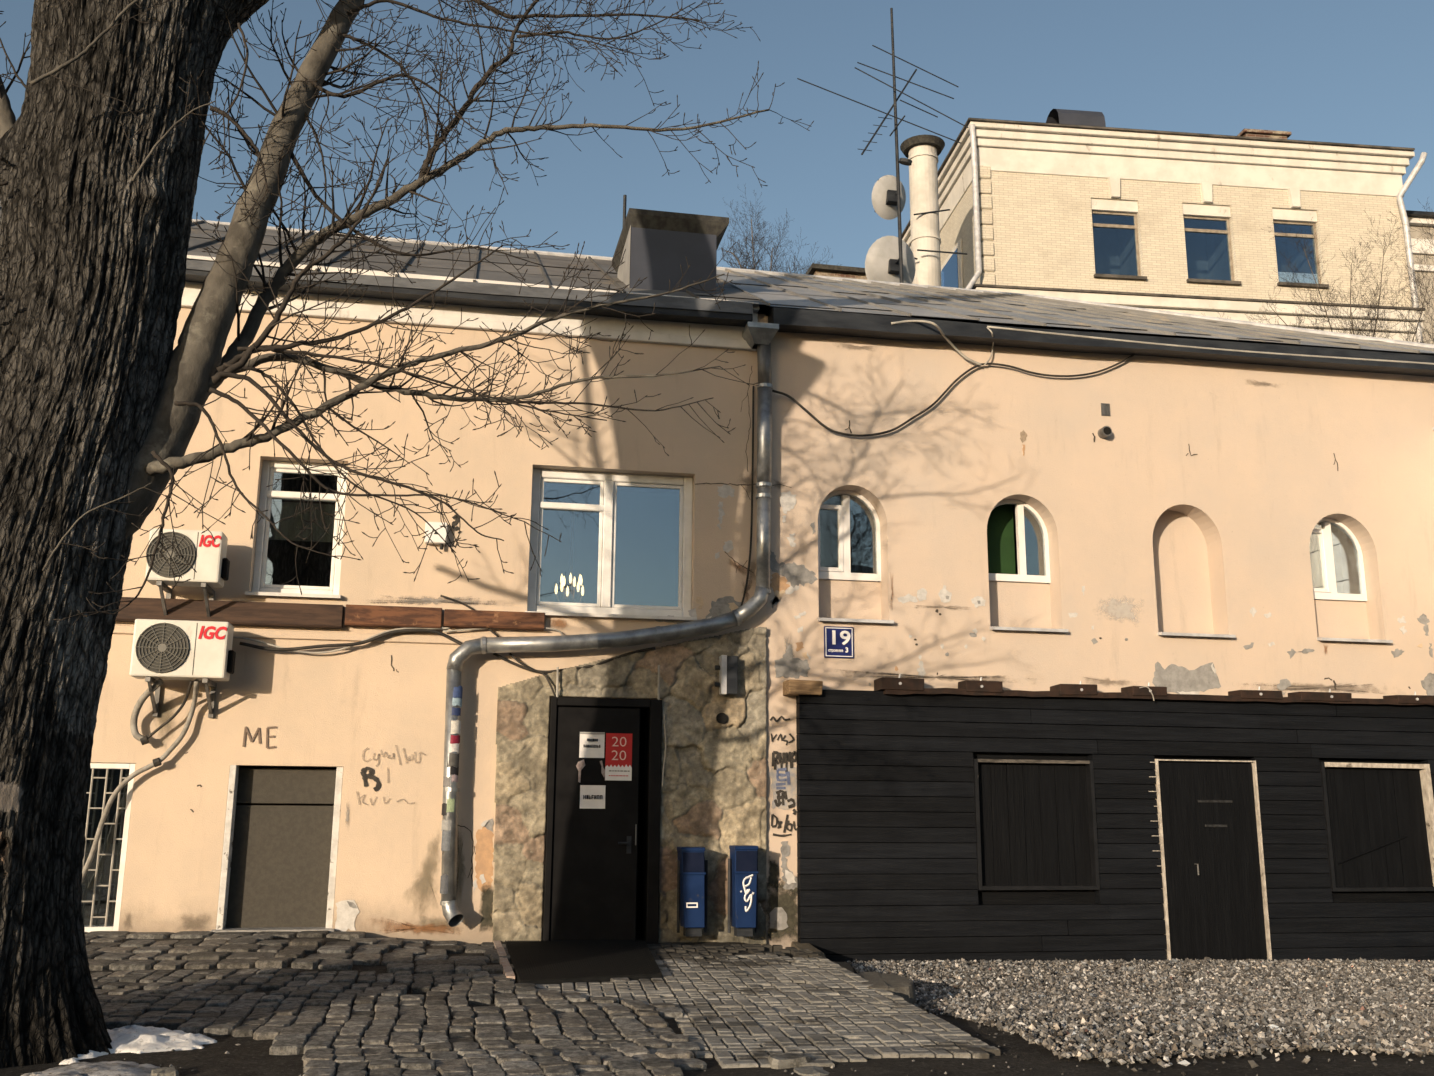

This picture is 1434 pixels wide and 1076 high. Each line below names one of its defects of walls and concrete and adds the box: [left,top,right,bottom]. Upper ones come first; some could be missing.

flaking render [770,491,818,608]
peeling [775,611,811,679]
peeling [1152,662,1221,694]
peeling [1391,614,1434,696]
leakage [416,847,435,897]
peeling [473,819,494,891]